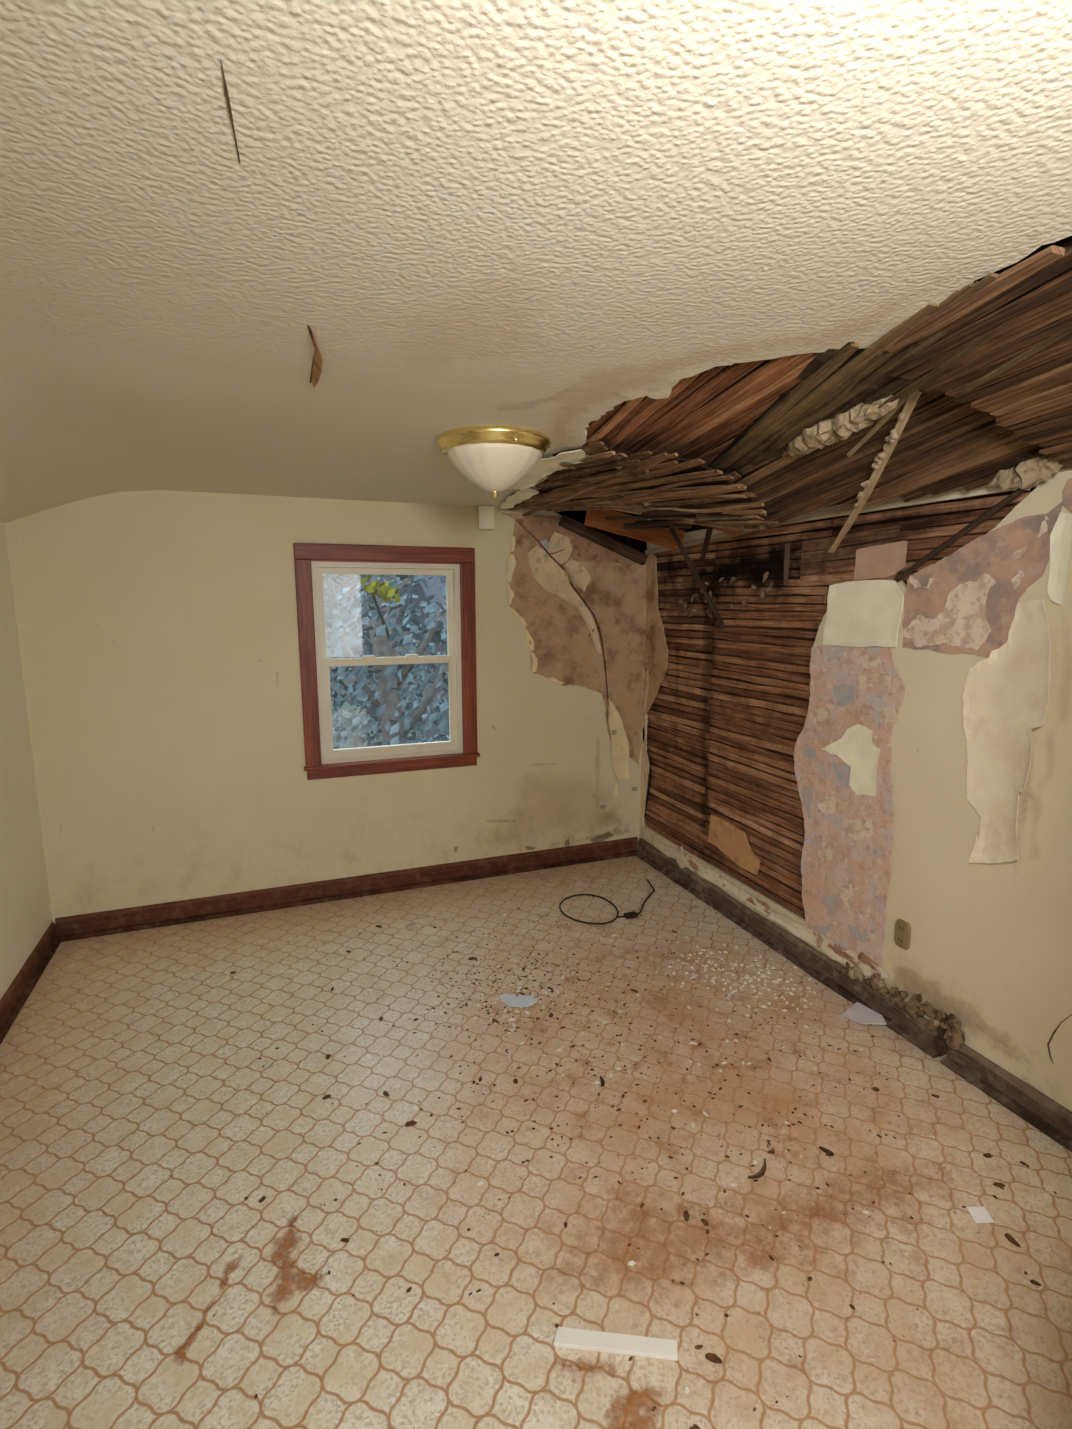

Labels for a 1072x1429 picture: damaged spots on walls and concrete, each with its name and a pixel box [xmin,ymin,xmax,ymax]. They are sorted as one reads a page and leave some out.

crack [221,60,240,163]
flaking render [501,478,1072,1056]